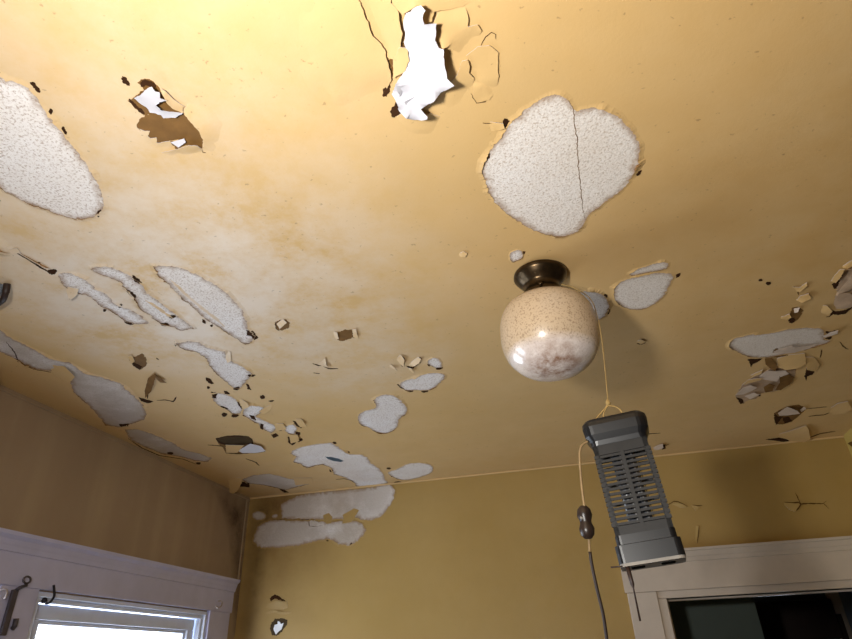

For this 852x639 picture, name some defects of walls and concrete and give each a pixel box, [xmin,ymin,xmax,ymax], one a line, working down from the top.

peeling [0,70,109,222]
peeling [121,76,222,155]
peeling [298,0,499,134]
peeling [476,89,646,239]
peeling [0,328,214,465]
peeling [55,263,448,550]
peeling [578,259,680,321]
peeling [725,283,847,404]
peeling [821,261,852,317]
crack [784,493,829,512]